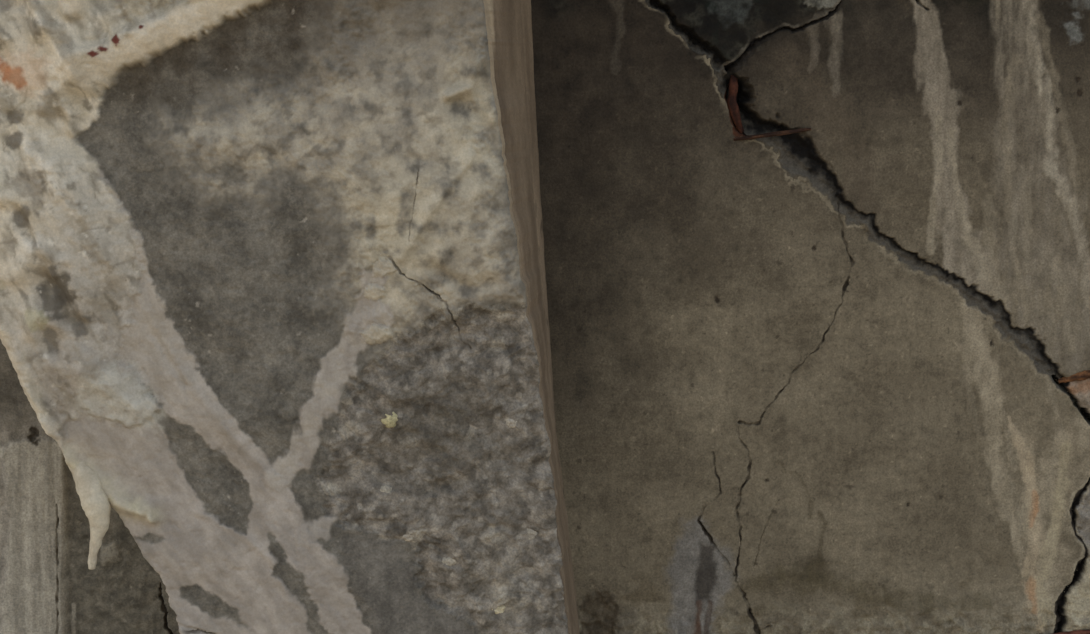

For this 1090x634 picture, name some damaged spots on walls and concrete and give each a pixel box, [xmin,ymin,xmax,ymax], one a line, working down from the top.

damp [129,0,527,375]
damp [531,0,886,212]
corrosion [727,75,744,133]
damp [894,0,1090,374]
damp [66,354,171,437]
crack [631,0,1090,634]
damp [659,303,1090,634]
corrosion [1058,370,1090,383]
crack [154,578,226,634]
spalling [1064,581,1090,631]